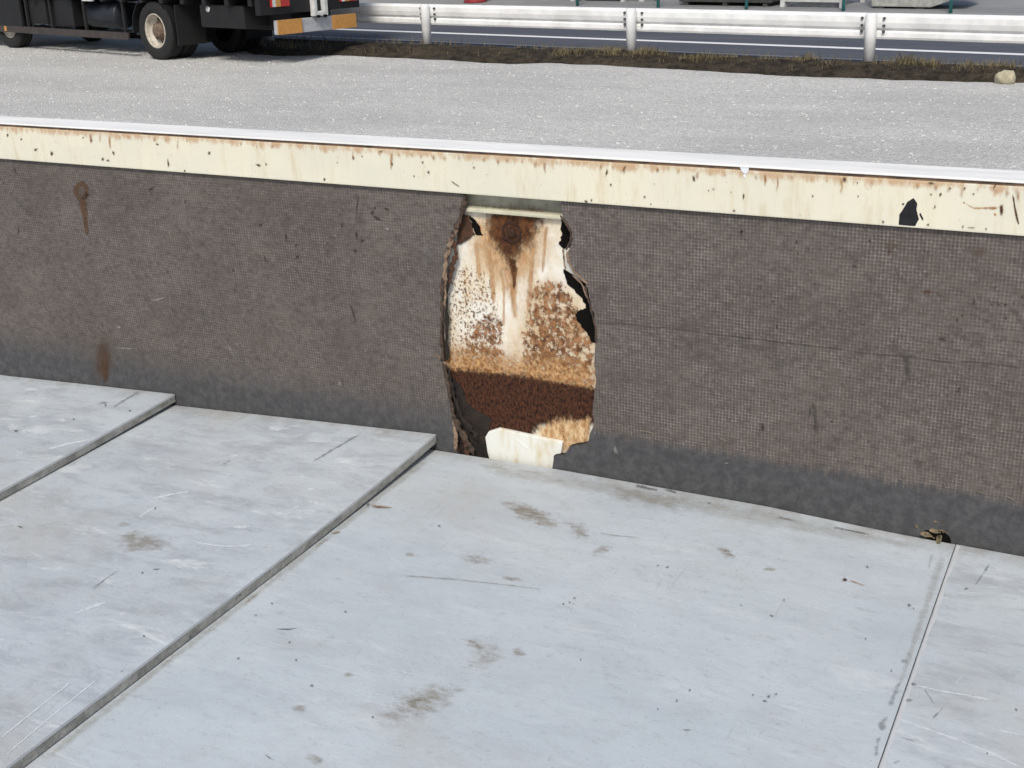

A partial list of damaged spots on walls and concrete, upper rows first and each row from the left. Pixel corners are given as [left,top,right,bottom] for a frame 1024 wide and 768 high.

corrosion [74,181,88,234]
peeling [899,198,929,226]
corrosion [444,208,595,449]
peeling [560,215,597,343]